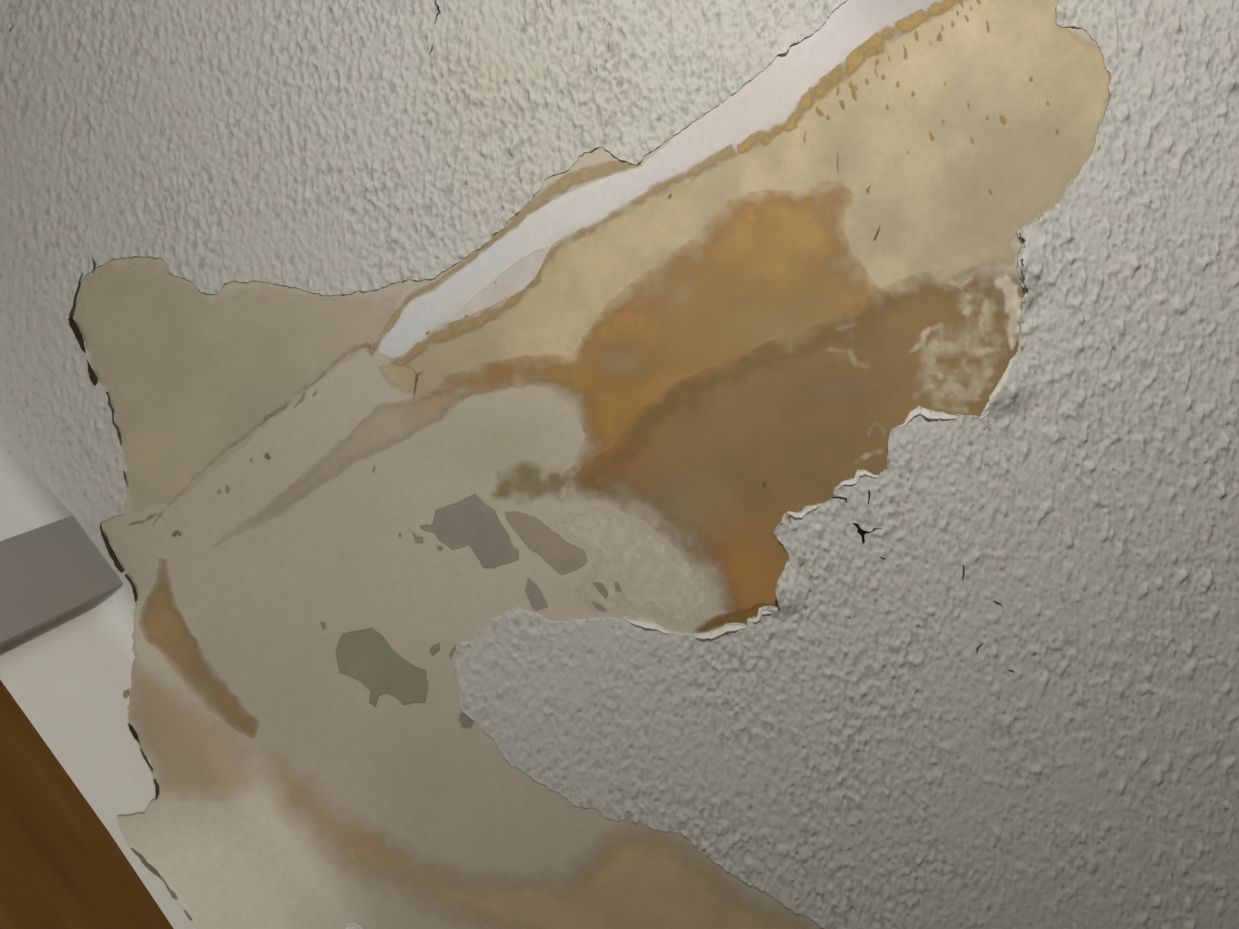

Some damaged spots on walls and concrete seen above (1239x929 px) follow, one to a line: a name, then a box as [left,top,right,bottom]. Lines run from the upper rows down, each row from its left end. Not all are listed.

peeling [828,27,918,109]
peeling [1055,15,1098,47]
damp [81,161,639,508]
damp [266,0,1110,632]
peeling [74,94,830,929]
peeling [835,470,879,490]
peeling [887,407,959,463]
damp [143,574,255,735]
damp [460,714,474,727]
damp [342,836,800,929]